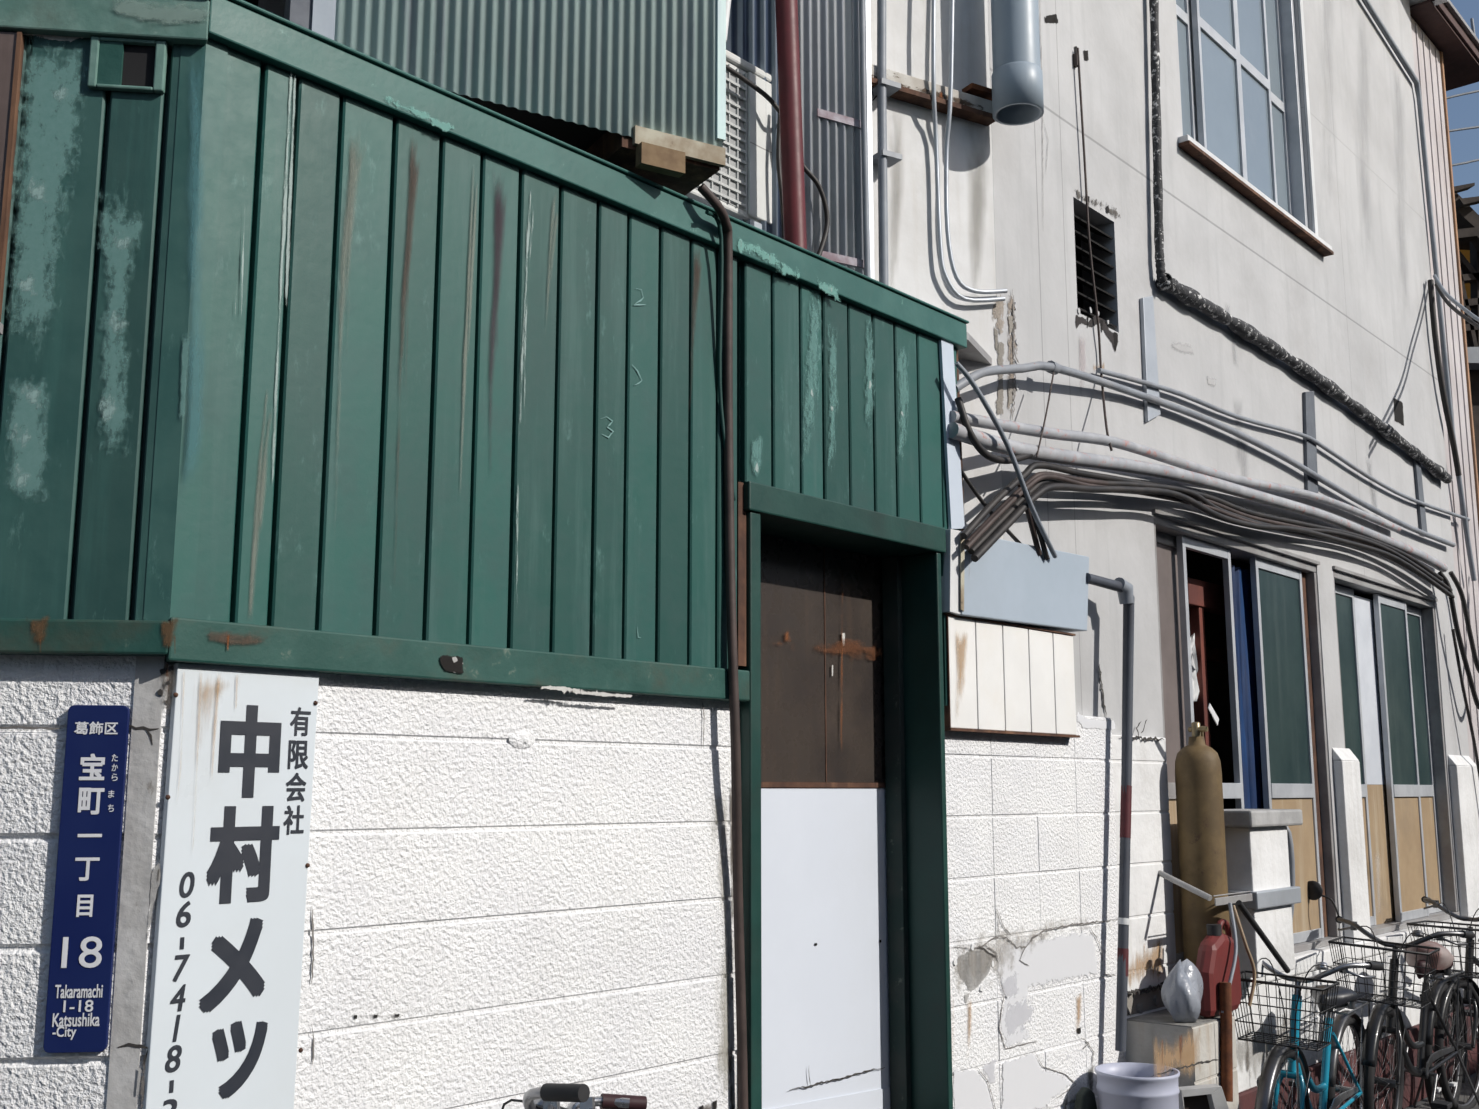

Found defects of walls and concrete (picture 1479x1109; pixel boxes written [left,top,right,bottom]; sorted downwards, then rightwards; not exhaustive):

peeling [8,34,87,334]
peeling [98,208,142,446]
rust [400,149,418,370]
rust [461,191,477,452]
rust [490,193,504,380]
peeling [7,382,49,498]
crack [0,724,62,732]
crack [791,1067,885,1090]
peeling [953,930,1099,1109]